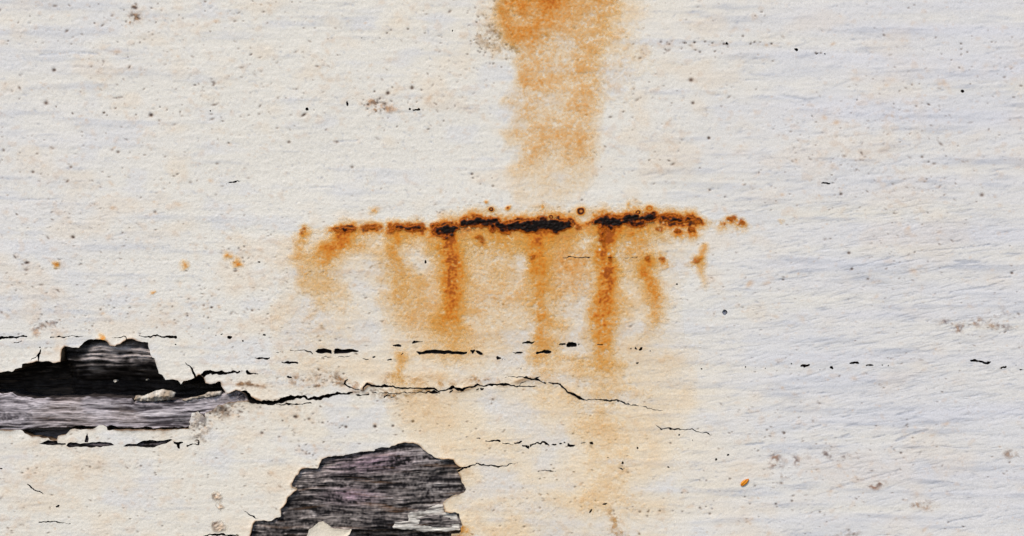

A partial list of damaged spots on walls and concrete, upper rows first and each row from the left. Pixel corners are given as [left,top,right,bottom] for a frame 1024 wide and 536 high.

corrosion [497,0,617,164]
corrosion [720,216,747,228]
corrosion [295,201,707,372]
crack [0,335,84,361]
peeling [0,339,249,441]
crack [111,334,710,435]
crack [791,361,889,369]
crack [970,359,1023,370]
peeling [250,442,466,536]